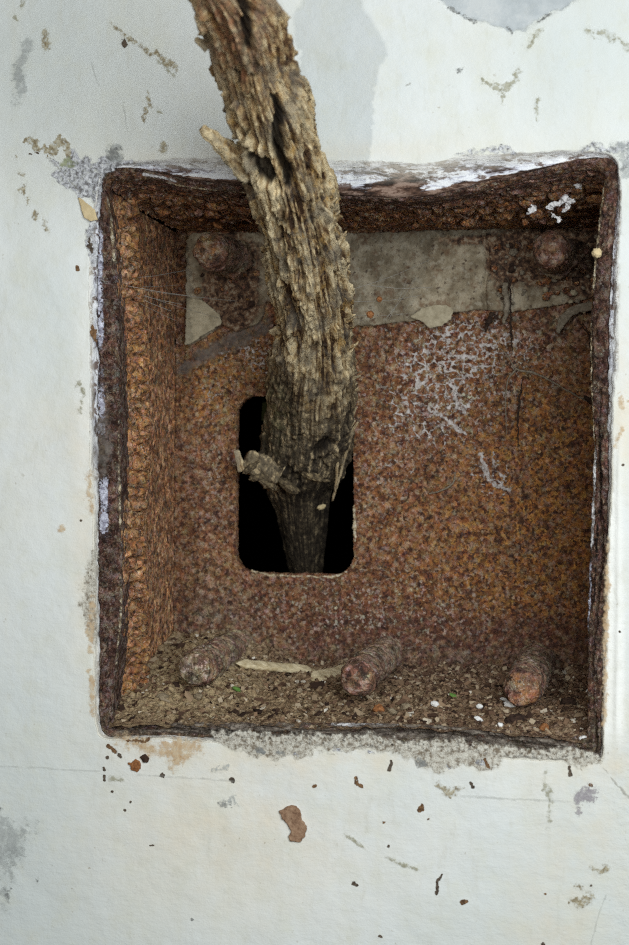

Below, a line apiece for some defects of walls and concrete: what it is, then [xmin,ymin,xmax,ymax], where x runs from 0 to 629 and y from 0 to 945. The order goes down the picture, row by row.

peeling [442,0,574,34]
flaking render [23,134,246,349]
corrosion [406,207,598,301]
peeling [99,470,122,534]
corrosion [601,544,610,725]